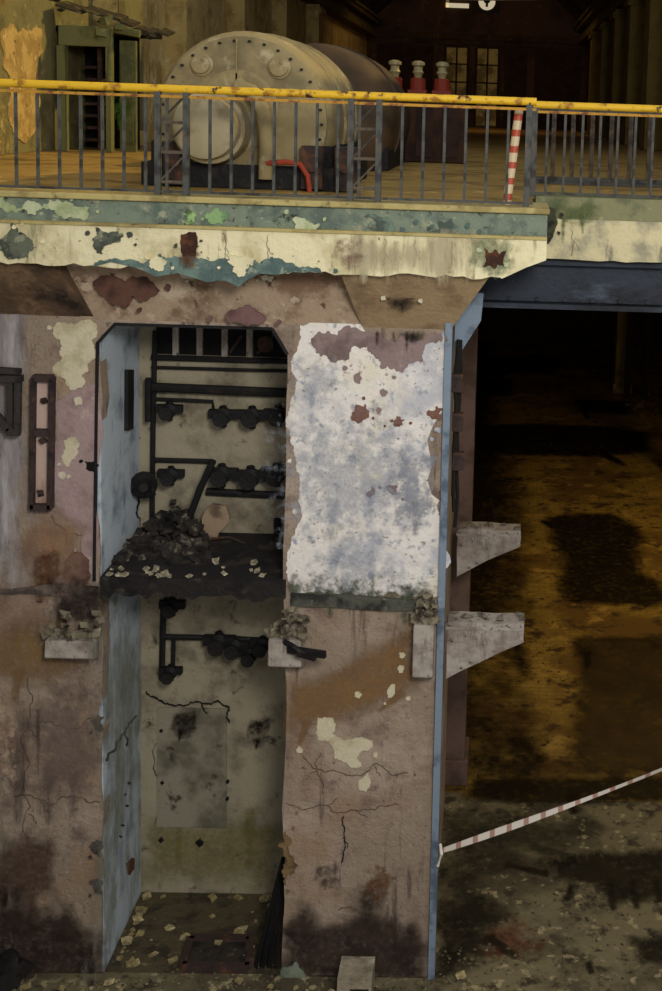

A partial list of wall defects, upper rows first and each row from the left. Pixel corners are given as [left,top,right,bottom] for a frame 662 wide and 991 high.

spalling [0,23,44,144]
peeling [0,197,326,313]
peeling [47,319,104,574]
peeling [286,323,451,625]
crack [105,691,230,761]
peeling [316,717,378,792]
crack [286,753,408,863]
leakage [0,835,105,974]
leakage [277,891,424,978]